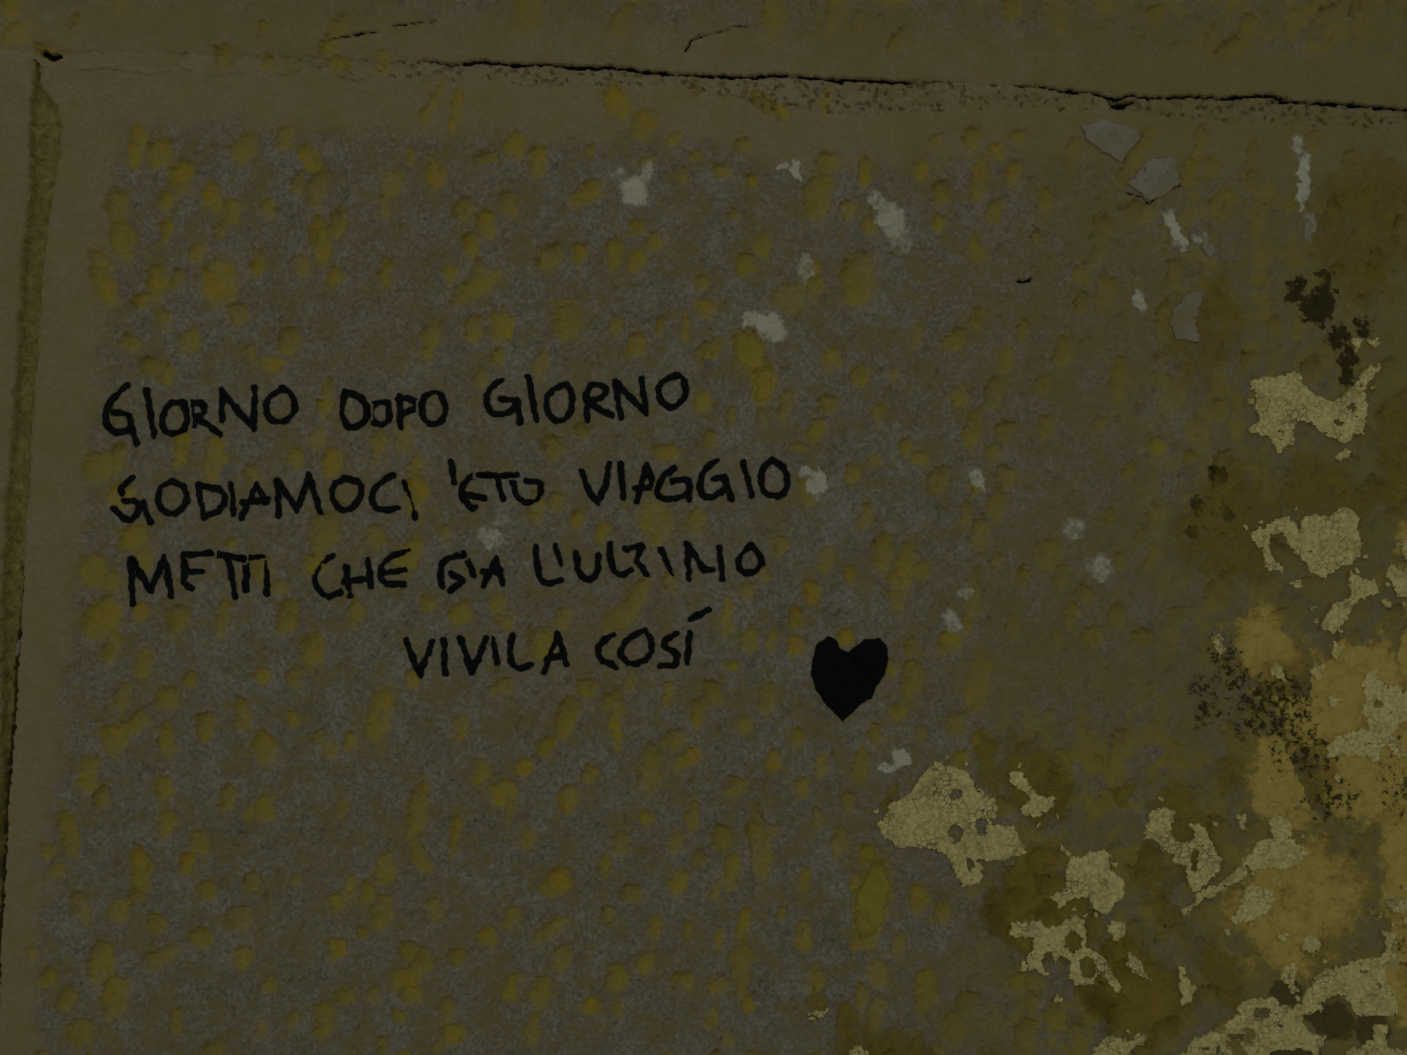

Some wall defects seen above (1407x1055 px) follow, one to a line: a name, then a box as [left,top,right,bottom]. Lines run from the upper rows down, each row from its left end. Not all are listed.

water stain [1285,136,1407,386]
peeling [1246,337,1381,461]
water stain [1177,390,1407,575]
peeling [1211,634,1226,658]
peeling [1243,507,1407,682]
peeling [1325,669,1407,767]
peeling [873,755,1059,887]
peeling [1009,844,1152,993]
peeling [1143,796,1308,935]
peeling [1178,886,1407,1055]
peeling [835,1045,869,1055]
peeling [1091,1030,1147,1055]